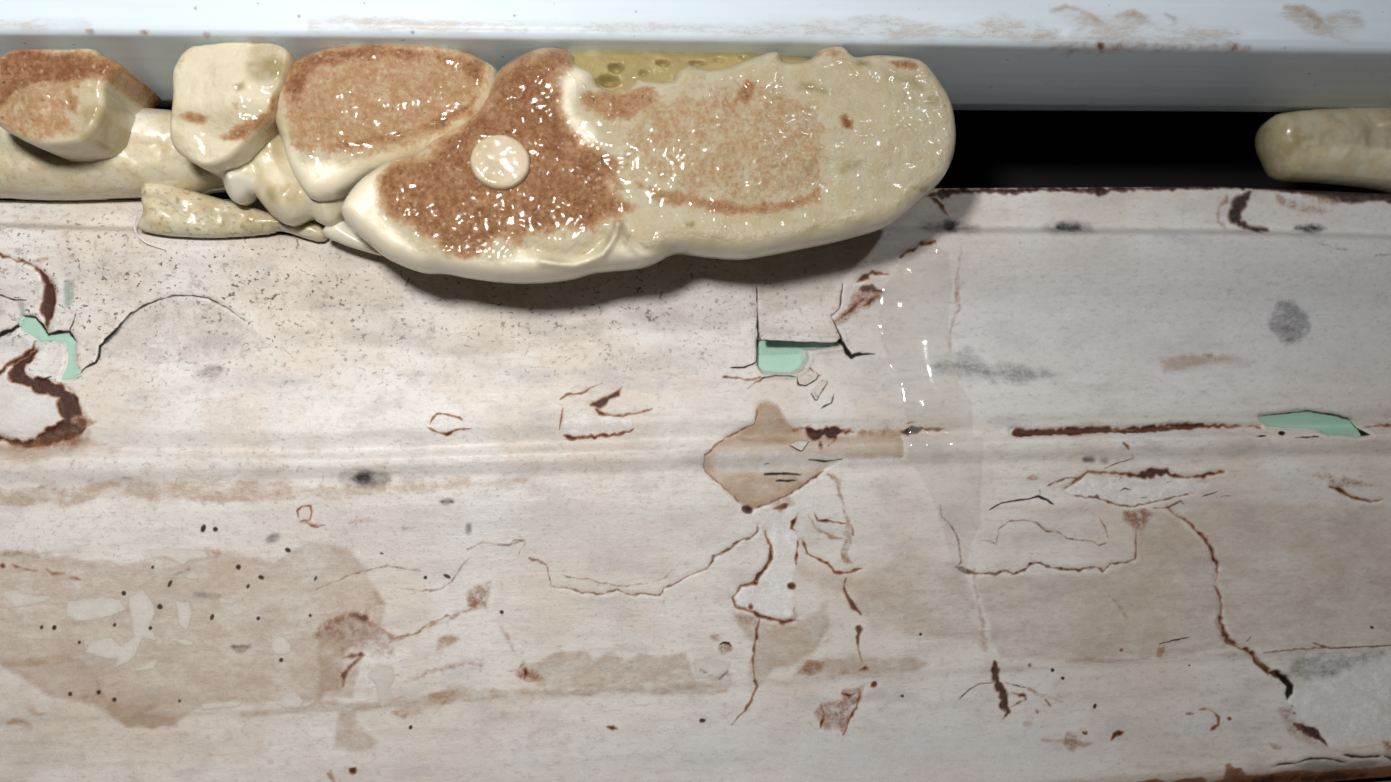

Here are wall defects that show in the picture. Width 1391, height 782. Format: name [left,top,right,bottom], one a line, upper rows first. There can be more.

peeling [19,303,81,380]
crack [0,253,245,448]
peeling [731,285,874,408]
crack [1012,422,1260,465]
peeling [1259,410,1370,438]
crack [1329,486,1379,502]
crack [504,526,759,595]
crack [802,475,863,658]
crack [951,495,1137,576]
water stain [2,590,156,672]
crack [1168,508,1391,770]
crack [961,660,1026,717]